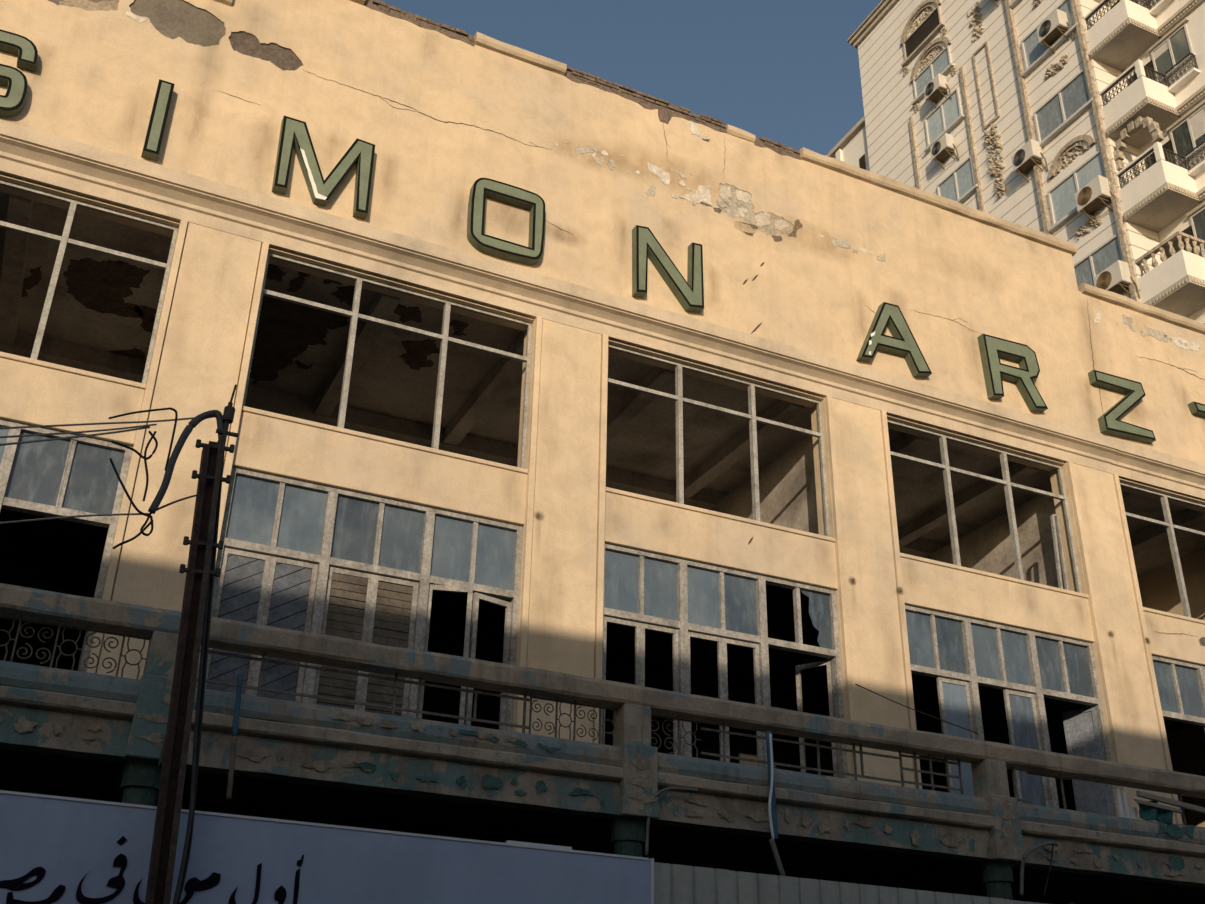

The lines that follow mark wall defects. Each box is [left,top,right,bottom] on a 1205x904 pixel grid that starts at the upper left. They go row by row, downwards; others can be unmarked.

spalling [48,0,303,71]
crack [304,70,547,149]
spalling [634,162,803,242]